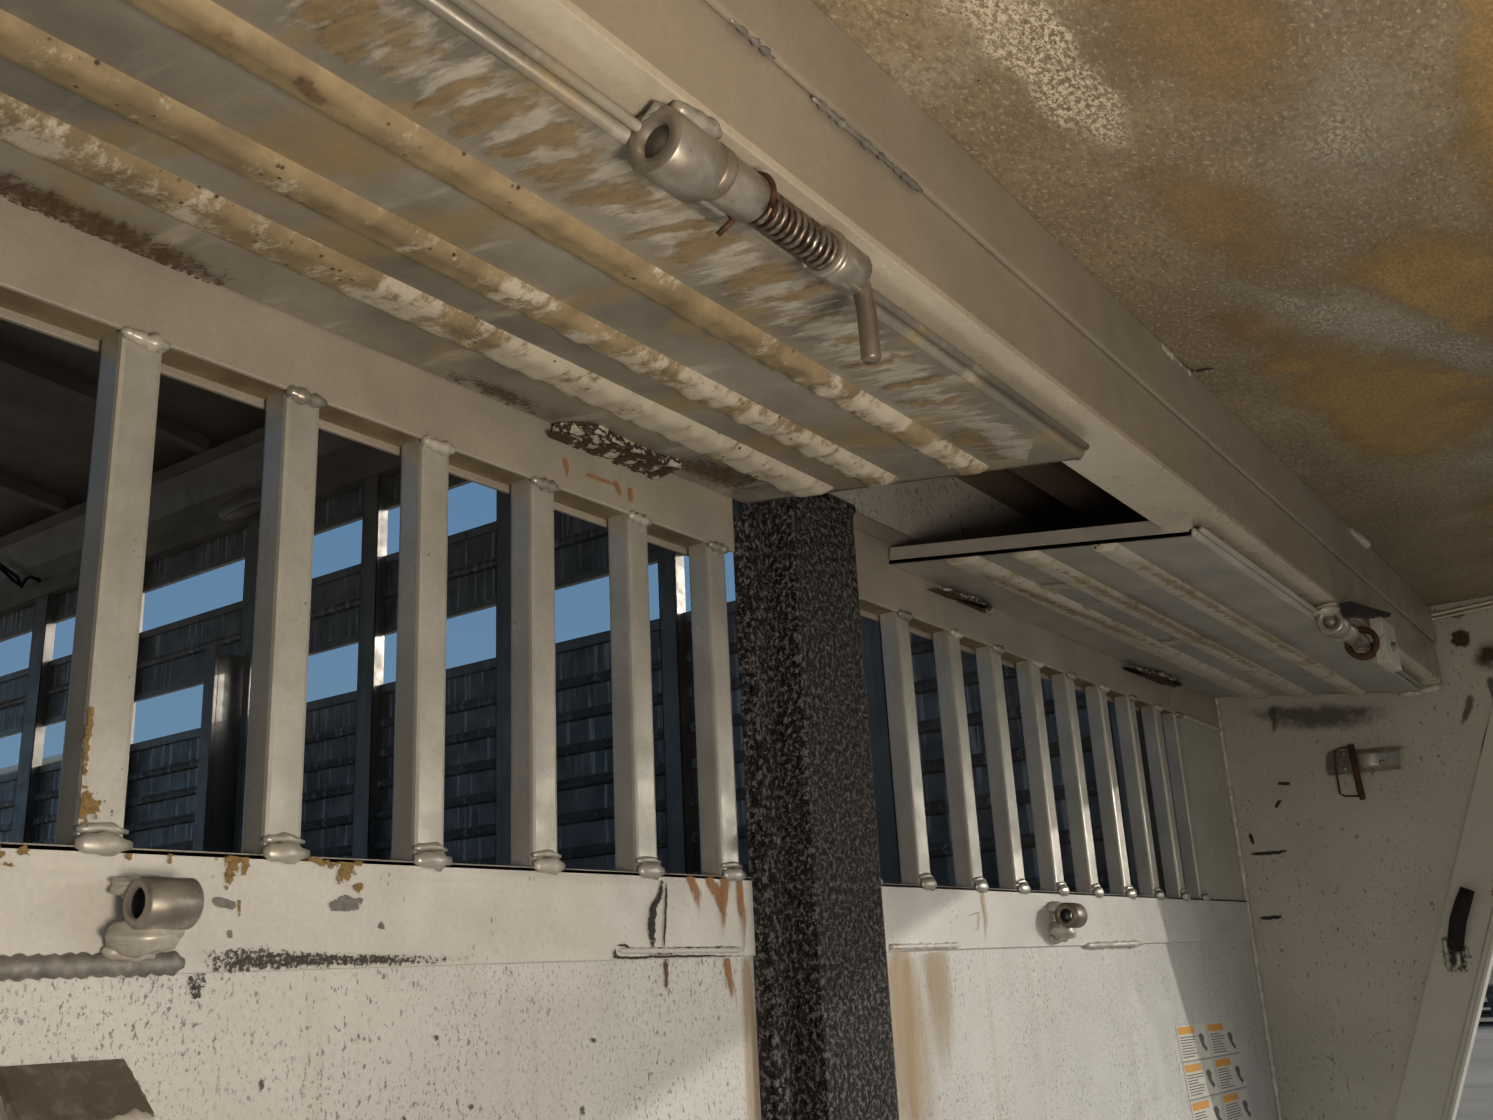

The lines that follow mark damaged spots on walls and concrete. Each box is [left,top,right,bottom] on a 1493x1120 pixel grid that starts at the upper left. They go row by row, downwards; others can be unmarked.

damp [415,72,538,139]
damp [489,122,670,214]
corrosion [0,172,230,286]
damp [628,220,740,264]
damp [1346,233,1493,340]
damp [1218,311,1493,458]
peeling [547,431,674,480]
corrosion [79,707,101,825]
corrosion [224,854,250,890]
corrosion [308,857,364,893]
corrosion [687,875,746,940]
corrosion [724,958,755,1110]